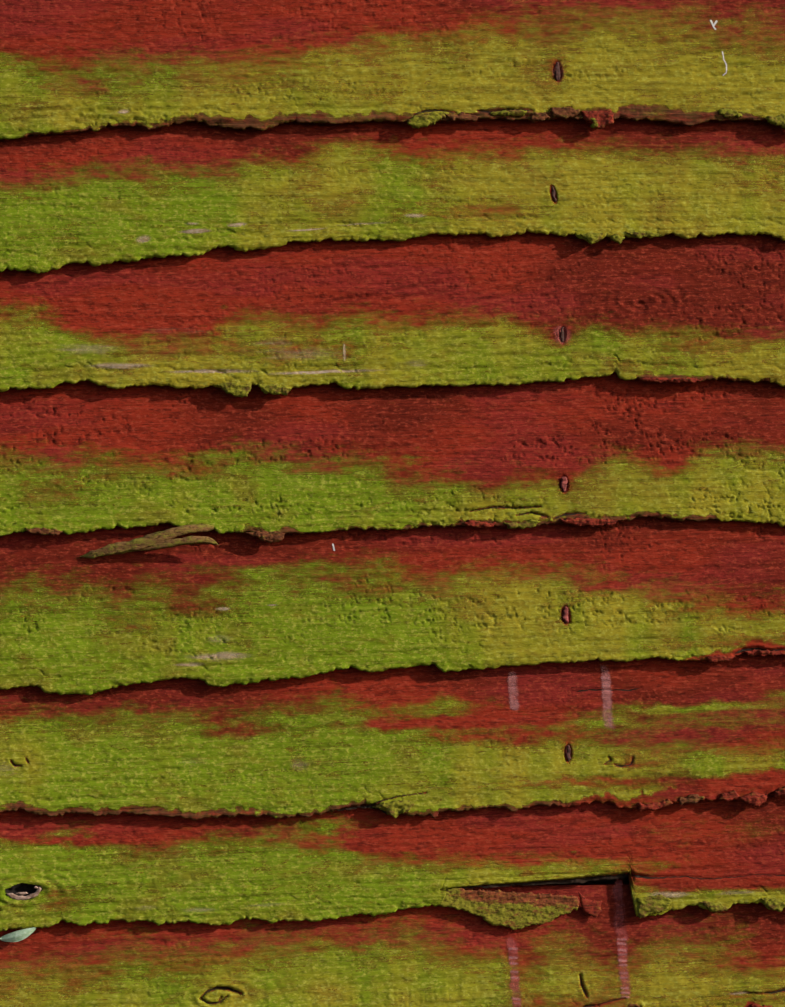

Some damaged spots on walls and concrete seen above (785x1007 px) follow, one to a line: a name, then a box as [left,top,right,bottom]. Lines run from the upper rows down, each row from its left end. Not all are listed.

peeling [407,107,614,129]
spalling [767,114,785,129]
crack [471,506,585,519]
crack [446,873,785,890]